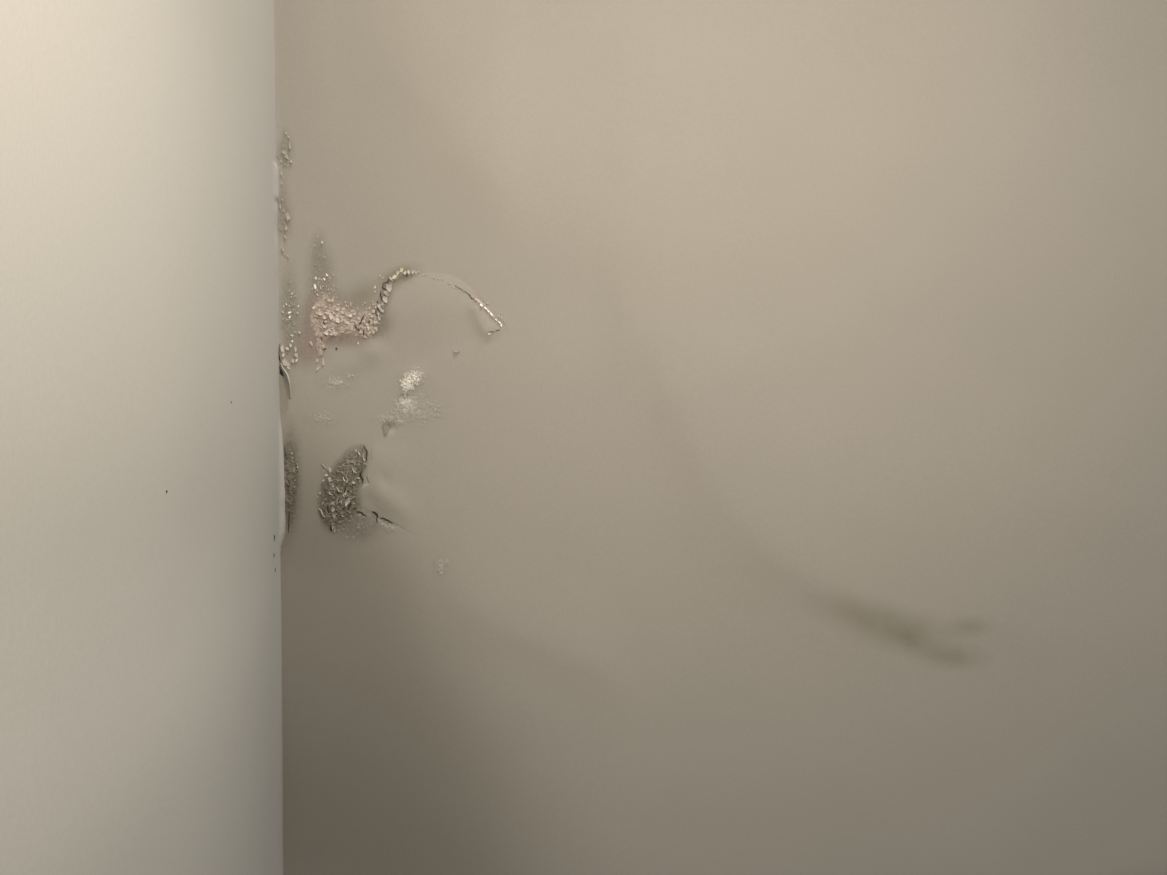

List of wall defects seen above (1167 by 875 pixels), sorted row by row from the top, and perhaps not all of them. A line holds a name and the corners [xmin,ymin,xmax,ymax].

peeling [280,235,505,370]
peeling [284,443,299,533]
peeling [317,443,368,532]